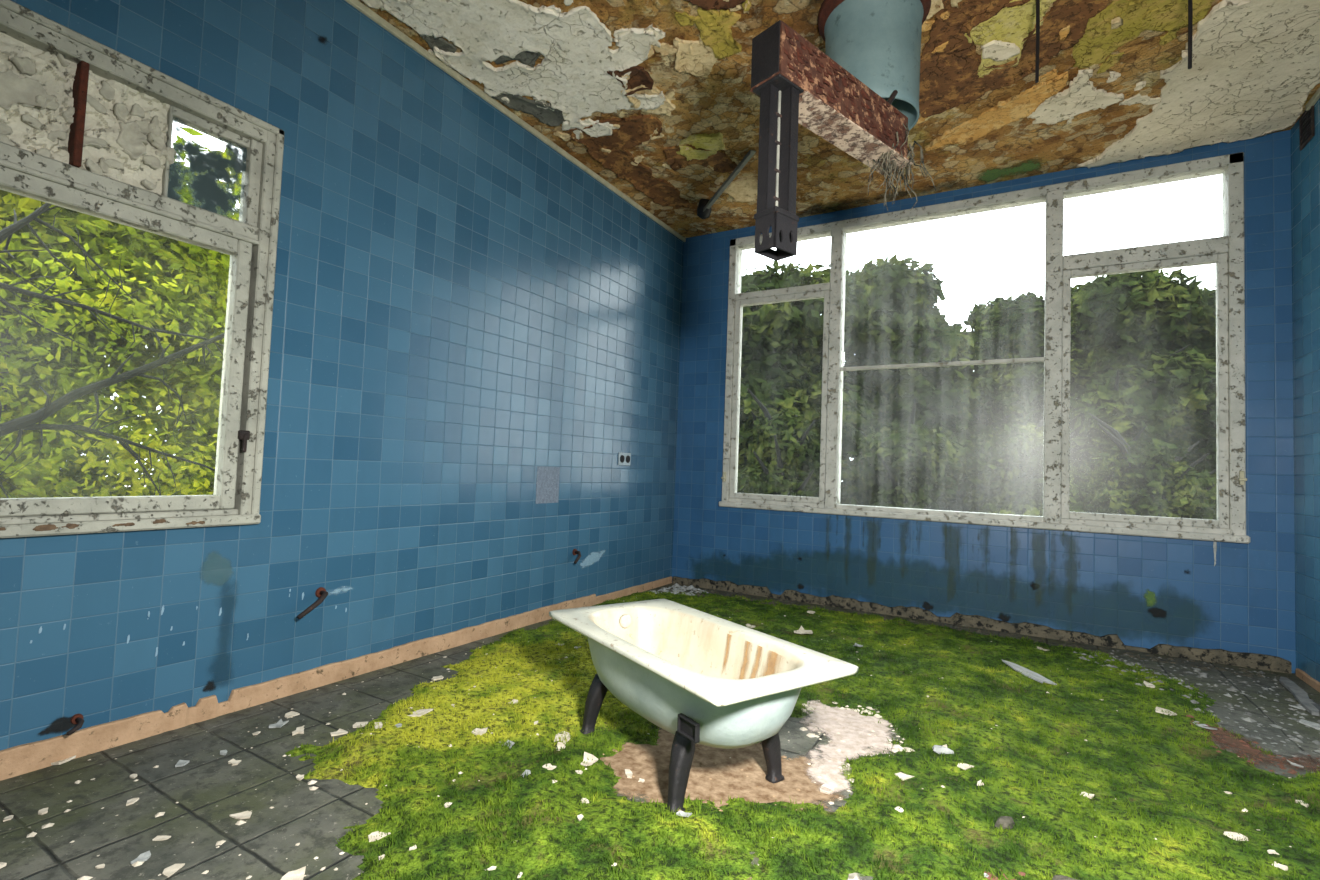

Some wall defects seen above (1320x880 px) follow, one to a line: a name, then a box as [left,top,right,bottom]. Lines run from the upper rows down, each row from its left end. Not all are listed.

peeling [361,0,758,208]
rust [783,25,908,153]
peeling [917,0,1320,168]
leakage [1148,607,1166,618]